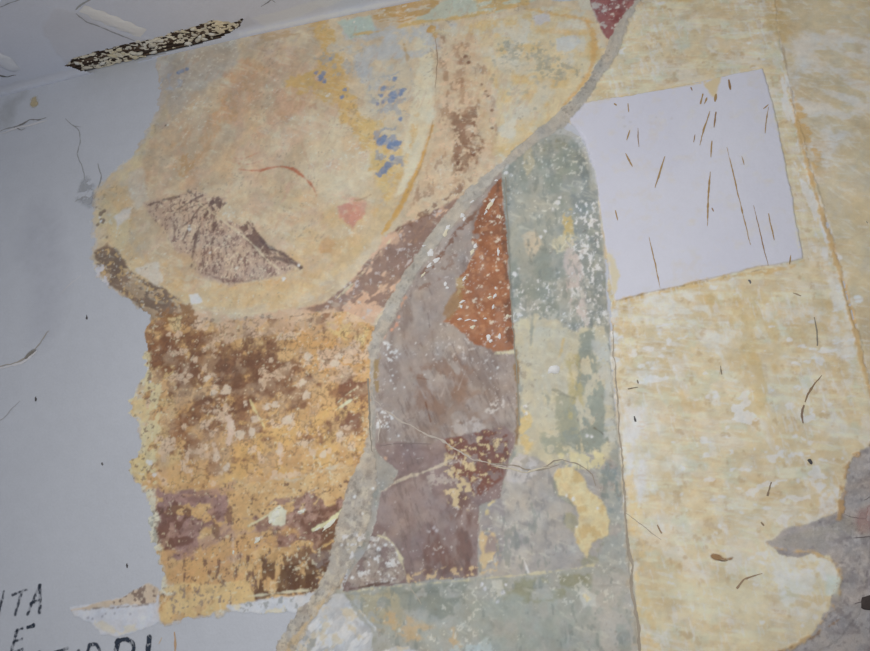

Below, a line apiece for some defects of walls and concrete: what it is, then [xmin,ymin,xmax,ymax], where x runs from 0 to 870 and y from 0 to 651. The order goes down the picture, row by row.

spalling [65,18,243,71]
crack [0,118,102,202]
crack [0,331,48,369]
peeling [586,0,870,651]
crack [367,378,596,486]
peeling [69,582,161,637]